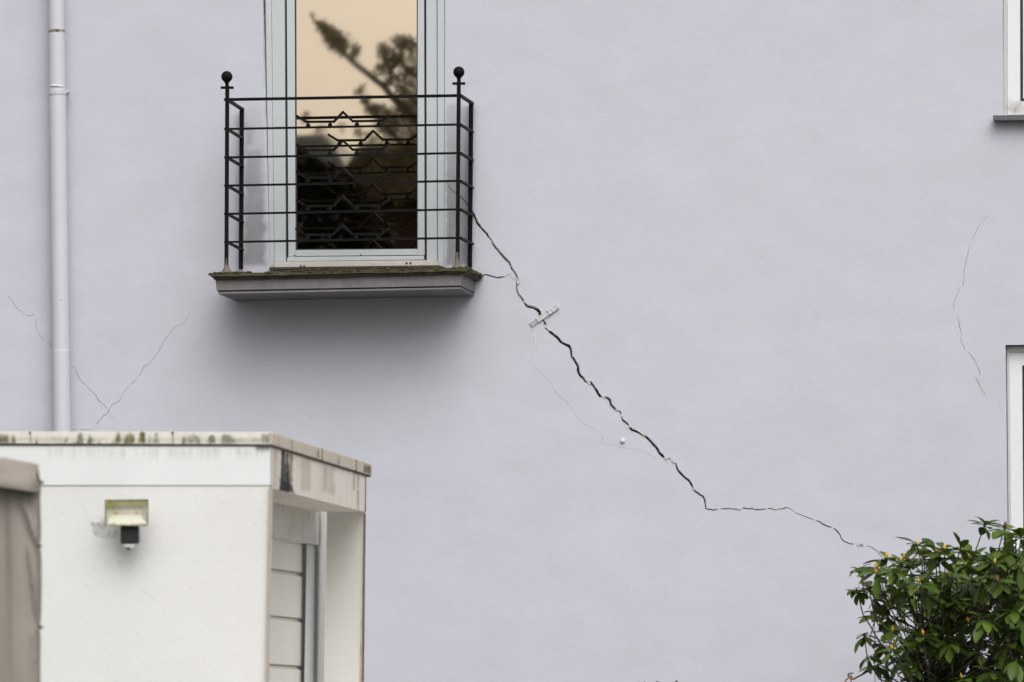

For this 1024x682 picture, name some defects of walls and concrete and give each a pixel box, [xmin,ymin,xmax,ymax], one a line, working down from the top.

water stain [280,450,294,493]
crack [448,185,883,559]